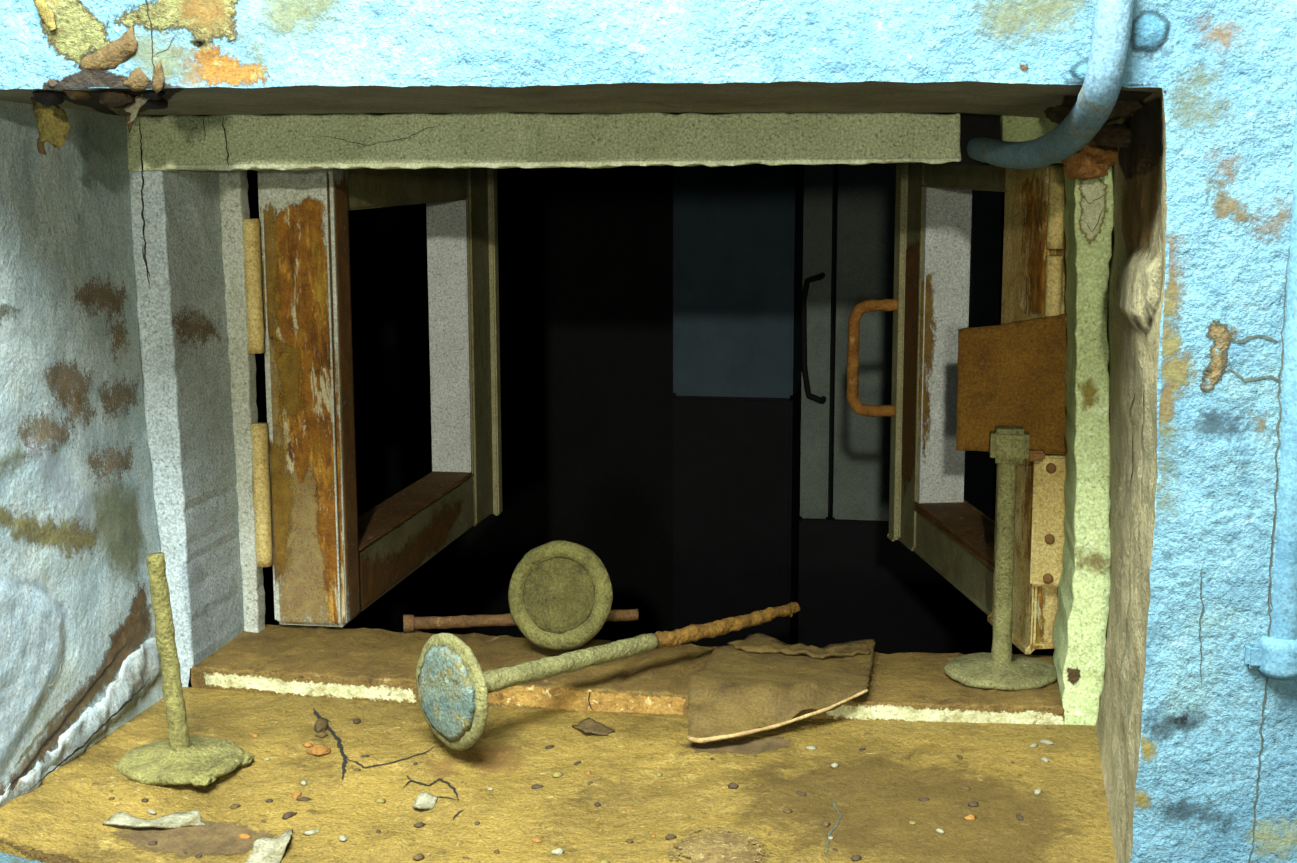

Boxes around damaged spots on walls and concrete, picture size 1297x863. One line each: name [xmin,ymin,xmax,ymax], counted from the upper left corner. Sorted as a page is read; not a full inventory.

peeling [30,0,238,155]
crack [139,120,150,282]
leakage [0,303,19,325]
rust [260,171,461,626]
peeling [201,671,417,703]
flaking render [0,637,162,807]
peeling [488,685,686,736]
peeling [102,810,205,829]
peeling [412,791,438,810]
peeling [0,839,86,863]
peeling [245,829,293,863]
spalling [665,824,772,863]